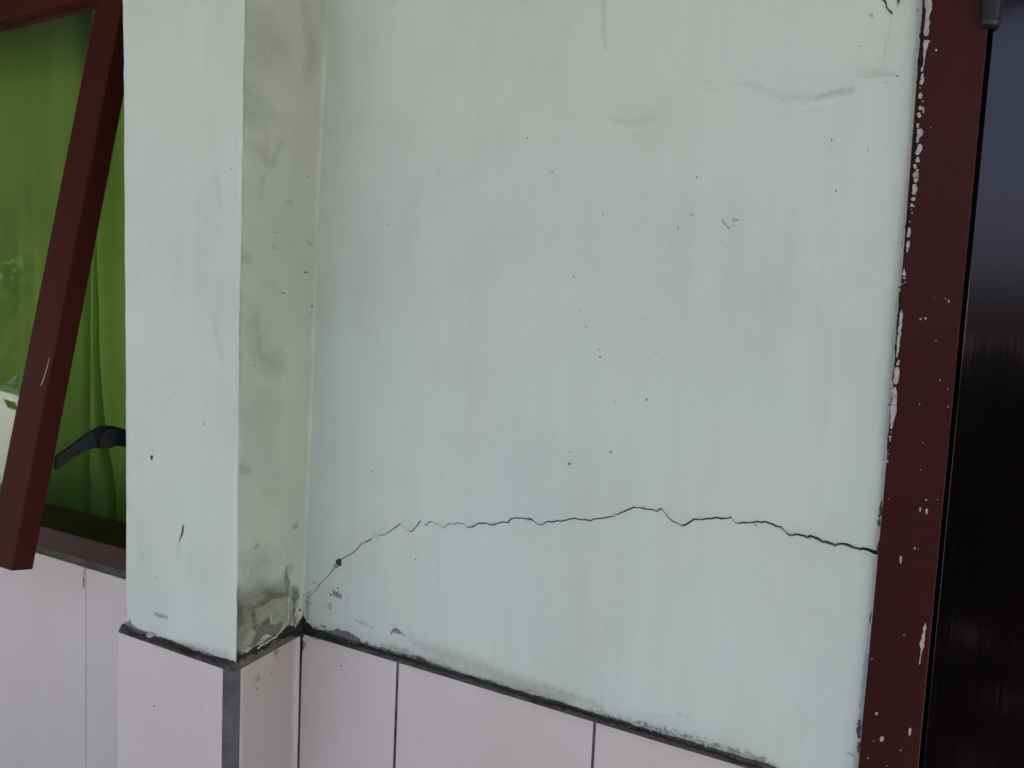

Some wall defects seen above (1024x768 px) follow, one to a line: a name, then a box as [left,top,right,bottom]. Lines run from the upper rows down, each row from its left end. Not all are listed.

peeling [854,0,932,768]
crack [311,506,878,595]
leakage [122,565,761,768]